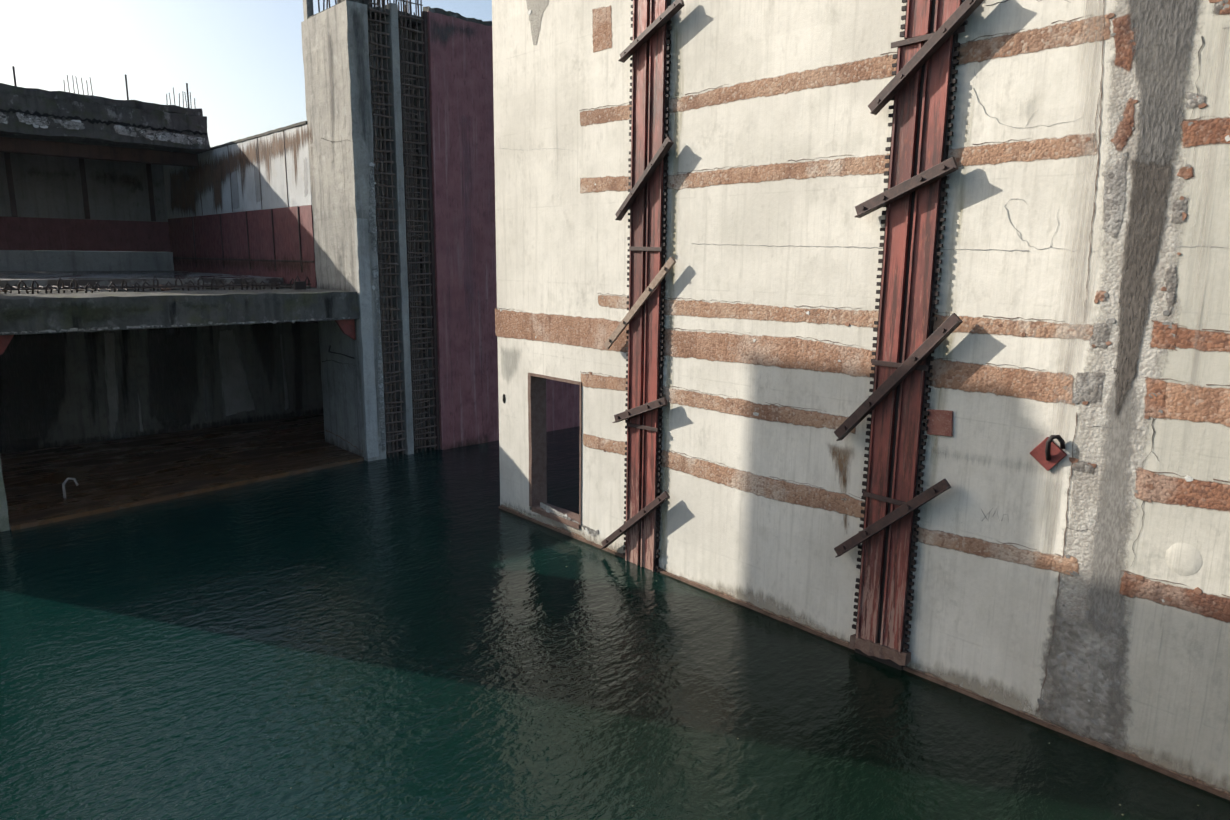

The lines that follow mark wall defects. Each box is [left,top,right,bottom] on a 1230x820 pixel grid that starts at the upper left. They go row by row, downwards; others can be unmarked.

spalling [669,52,897,113]
spalling [956,13,1141,72]
corrosion [170,126,313,217]
spalling [667,154,890,190]
crack [940,0,1105,318]
spalling [948,98,1138,238]
crack [692,242,881,250]
water stain [0,301,324,454]
spalling [495,293,629,353]
spalling [663,297,879,378]
water stain [1082,0,1197,708]
corrosion [832,446,849,487]